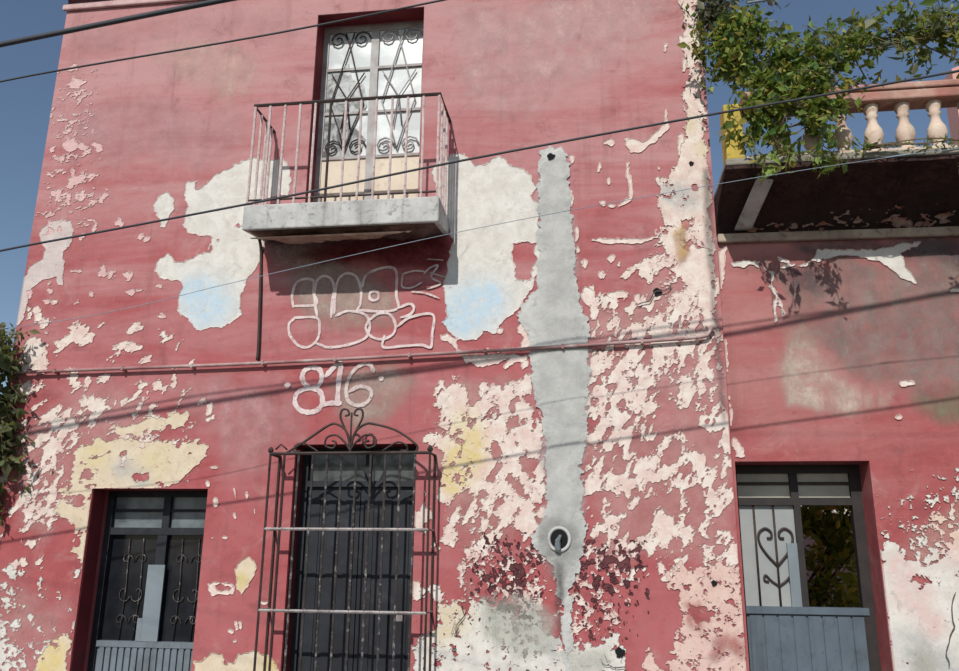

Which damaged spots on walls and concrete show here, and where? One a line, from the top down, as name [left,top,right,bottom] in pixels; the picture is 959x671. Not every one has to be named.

peeling [0,63,219,671]
peeling [98,157,411,337]
peeling [411,0,921,671]
peeling [747,203,956,232]
peeling [208,556,257,596]
peeling [193,621,279,671]
damp [470,532,649,668]
peeling [880,467,959,671]